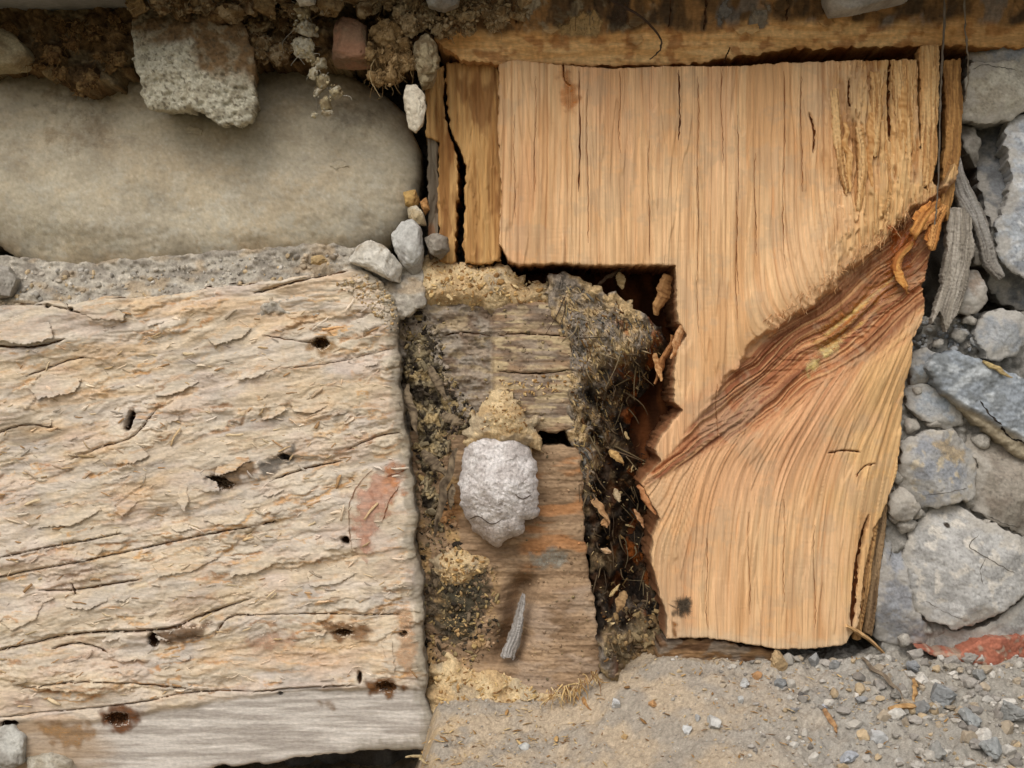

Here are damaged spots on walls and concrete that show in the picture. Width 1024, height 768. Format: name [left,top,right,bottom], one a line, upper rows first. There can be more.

crack [201,271,346,293]
crack [20,303,80,313]
crack [0,339,86,377]
crack [266,335,394,368]
crack [70,410,156,460]
crack [269,432,402,482]
crack [348,470,405,548]
crack [0,521,275,594]
crack [850,514,892,627]
crack [0,597,400,653]
crack [7,681,355,717]